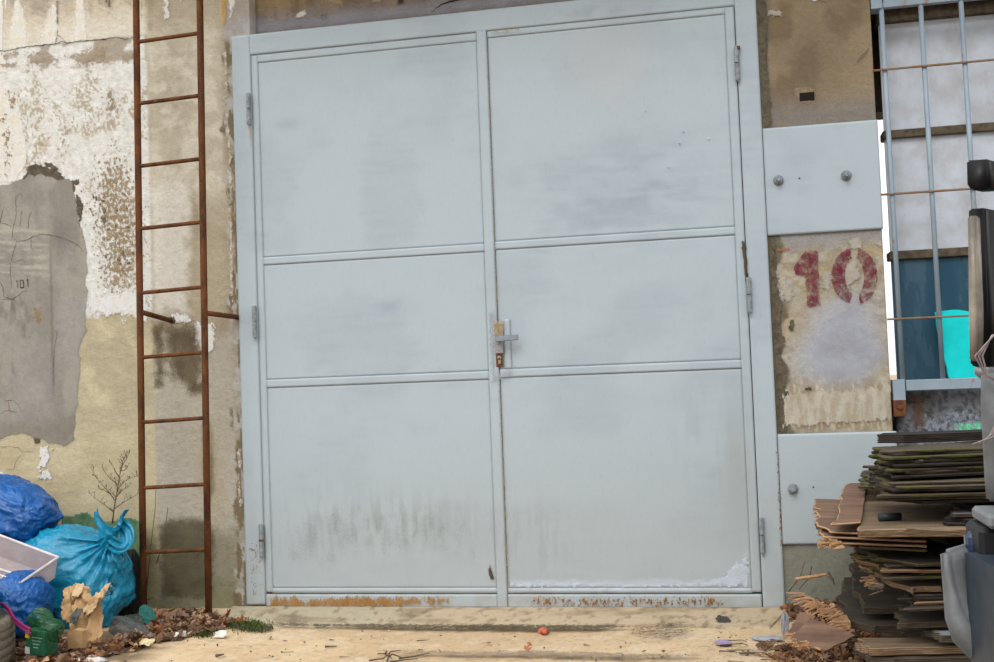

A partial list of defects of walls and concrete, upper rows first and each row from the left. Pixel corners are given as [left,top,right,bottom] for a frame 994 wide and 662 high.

damp [0,0,60,72]
damp [72,0,87,42]
damp [0,88,27,183]
peeling [821,237,862,291]
peeling [769,237,795,432]
rust [269,595,449,607]
rust [531,595,722,607]